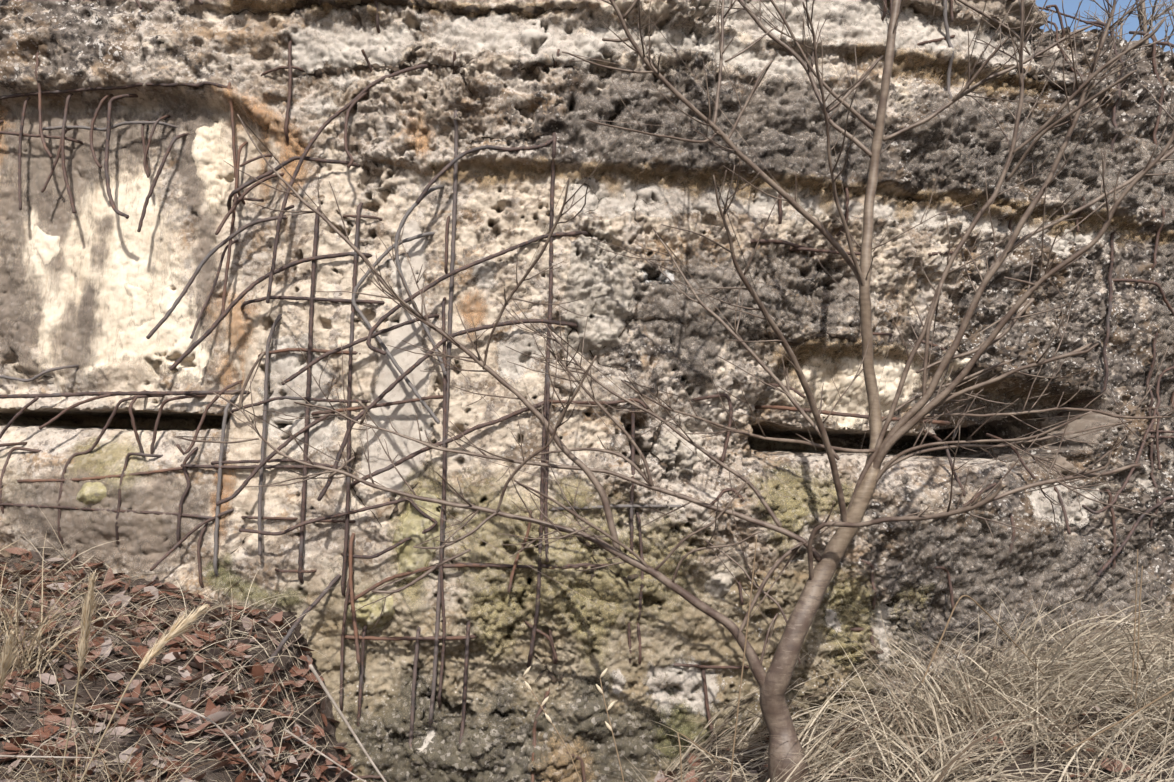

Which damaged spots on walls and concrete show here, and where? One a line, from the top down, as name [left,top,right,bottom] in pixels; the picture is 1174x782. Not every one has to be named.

spalling [283,0,1053,118]
peeling [191,119,235,214]
rust [214,88,309,190]
peeling [0,109,211,383]
water stain [0,92,217,372]
rust [207,294,251,390]
peeling [258,332,343,455]
peeling [359,211,434,500]
peeling [497,337,544,385]
rust [212,464,235,537]
water stain [551,476,589,507]
water stain [346,578,688,782]